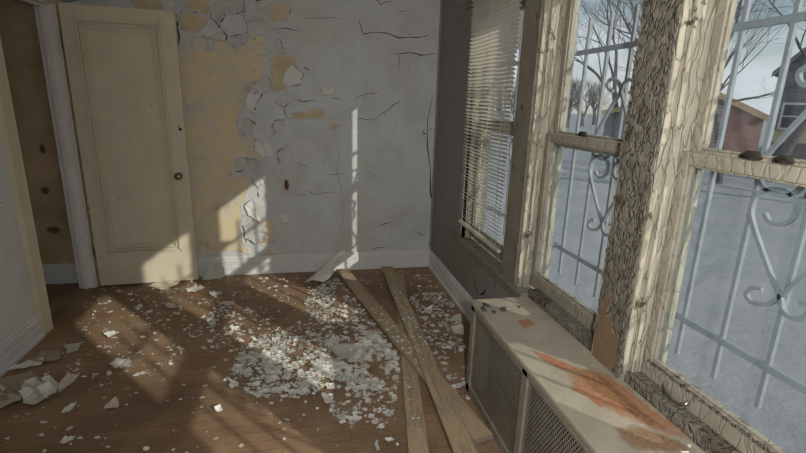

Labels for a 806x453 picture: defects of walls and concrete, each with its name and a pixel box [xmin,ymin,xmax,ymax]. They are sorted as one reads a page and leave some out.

peeling [129,0,340,292]
crack [252,91,402,142]
crack [421,95,433,204]
peeling [593,0,680,374]
rust [537,353,686,452]